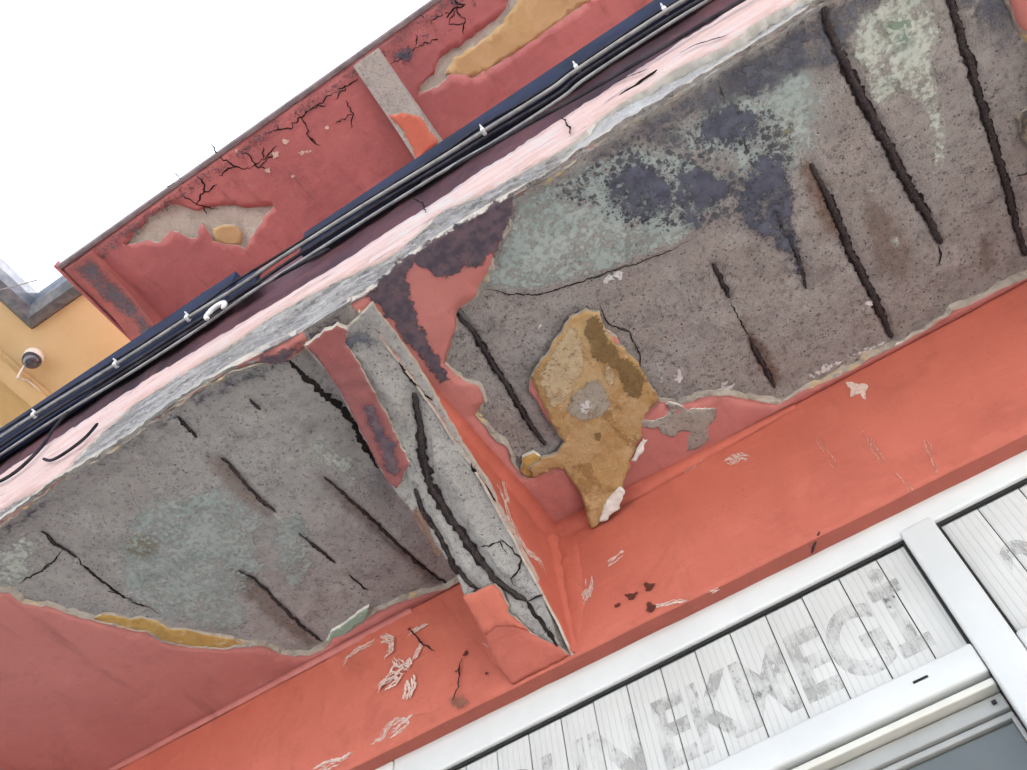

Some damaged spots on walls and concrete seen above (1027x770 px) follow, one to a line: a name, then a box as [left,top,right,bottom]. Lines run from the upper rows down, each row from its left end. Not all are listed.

crack [390,0,466,65]
crack [618,69,657,95]
crack [167,79,358,214]
water stain [366,0,947,383]
spalling [71,0,1027,528]
crack [485,241,688,296]
crack [289,360,379,469]
spalling [0,301,560,657]
crack [410,629,434,651]
crack [452,659,462,701]
crack [481,539,558,647]